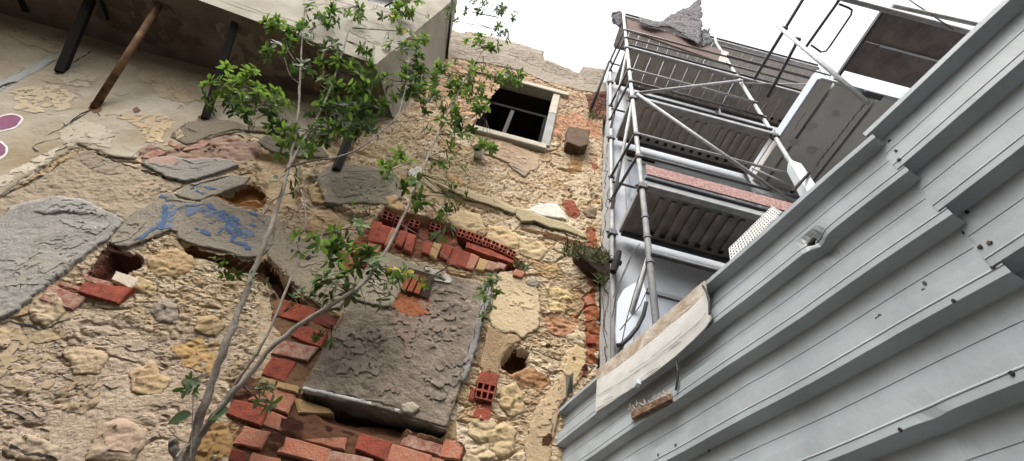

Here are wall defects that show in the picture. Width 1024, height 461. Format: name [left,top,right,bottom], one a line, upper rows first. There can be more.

flaking render [0,117,601,461]